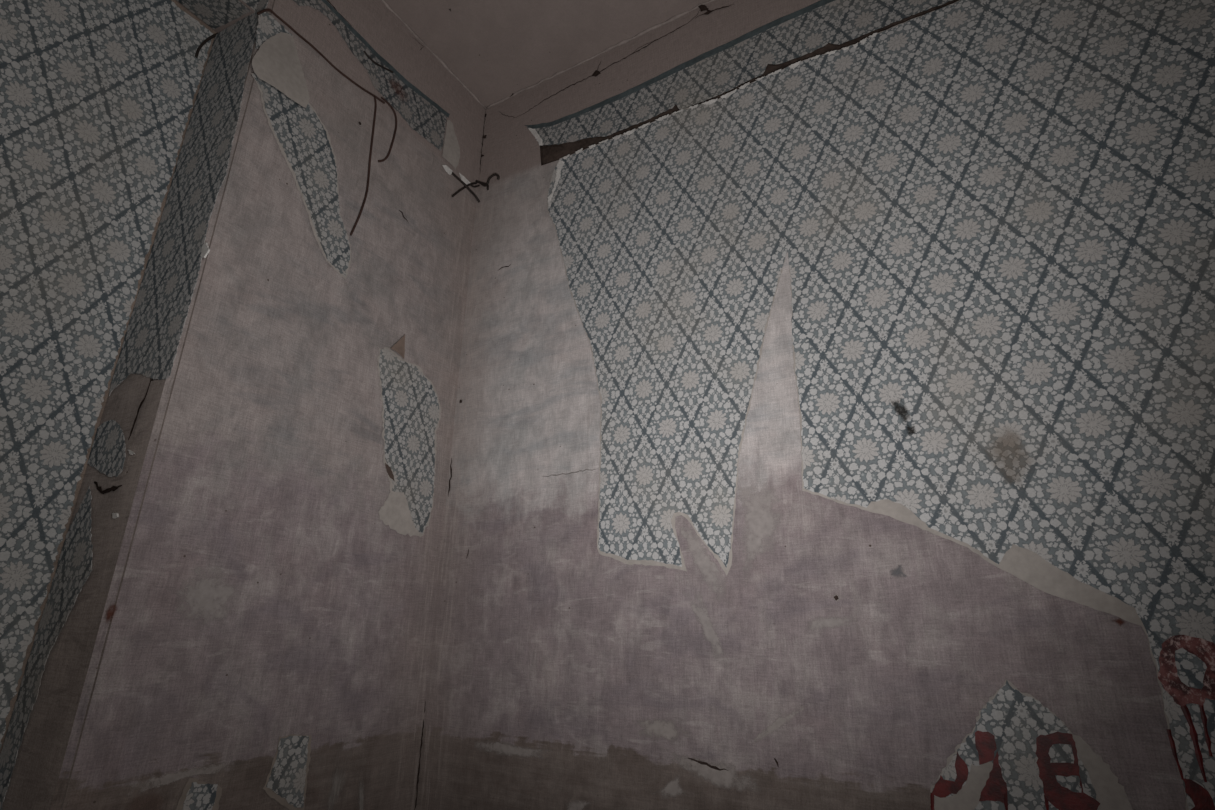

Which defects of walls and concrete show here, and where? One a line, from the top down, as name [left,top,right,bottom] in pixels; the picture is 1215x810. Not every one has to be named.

crack [480,4,733,167]
leakage [893,402,915,434]